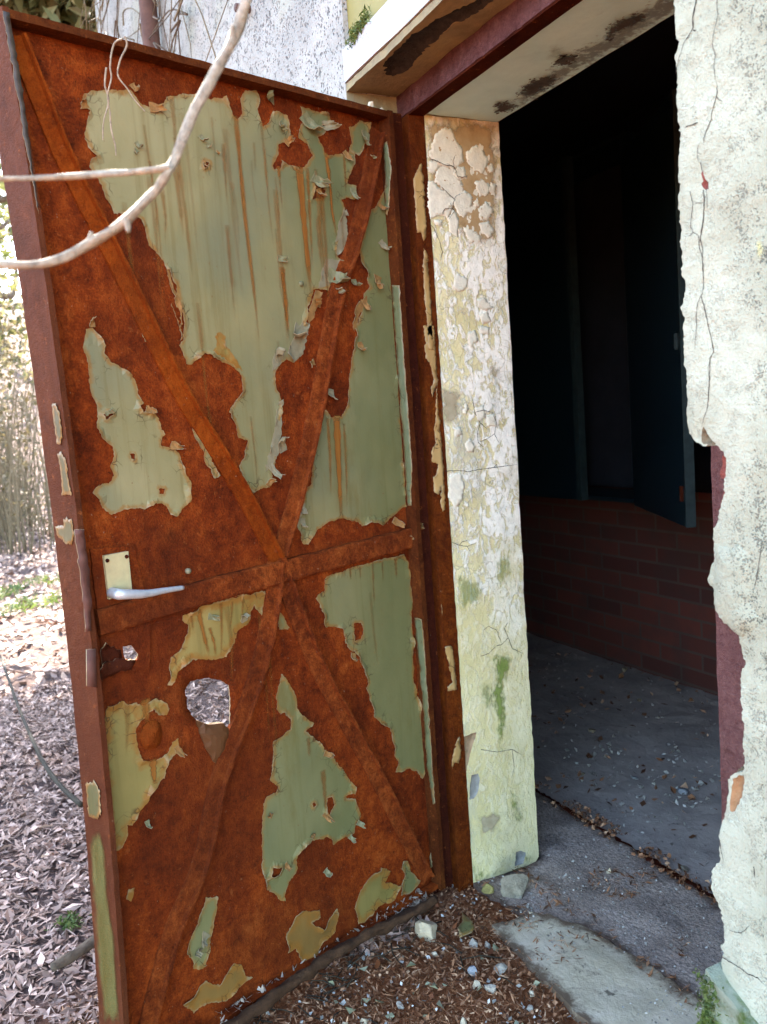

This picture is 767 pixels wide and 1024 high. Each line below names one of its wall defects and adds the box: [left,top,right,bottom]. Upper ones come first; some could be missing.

peeling [80,82,425,545]
peeling [413,127,501,512]
leakage [514,0,674,104]
crack [676,0,731,424]
peeling [261,674,366,901]
peeling [316,554,435,804]